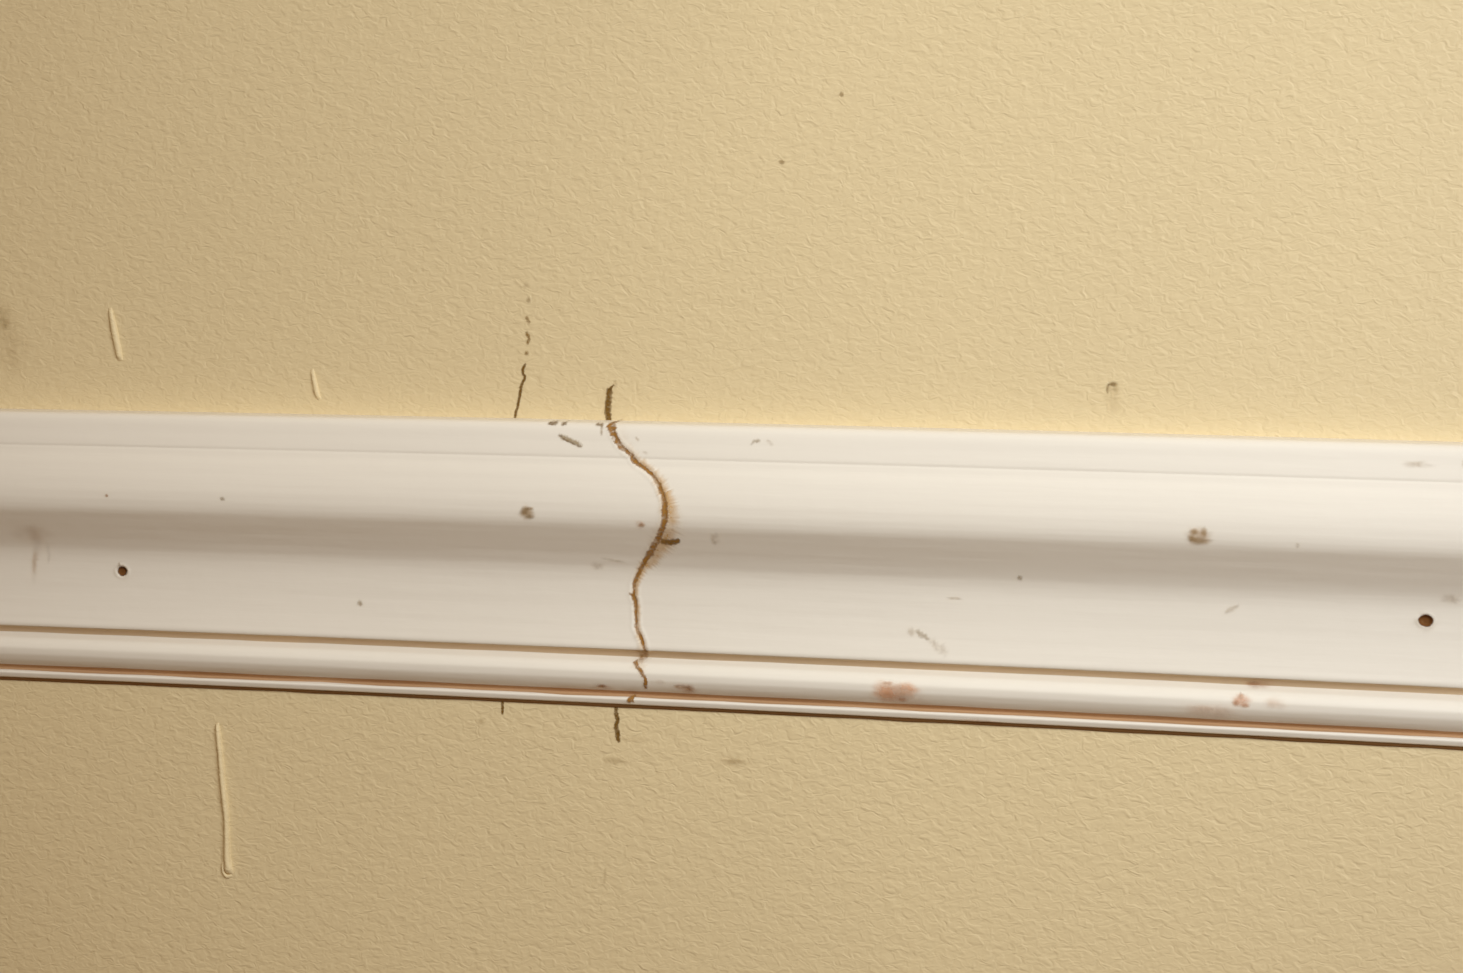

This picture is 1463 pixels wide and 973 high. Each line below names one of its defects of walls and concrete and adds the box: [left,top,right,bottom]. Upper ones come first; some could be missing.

crack [514,318,530,418]
crack [597,385,680,742]